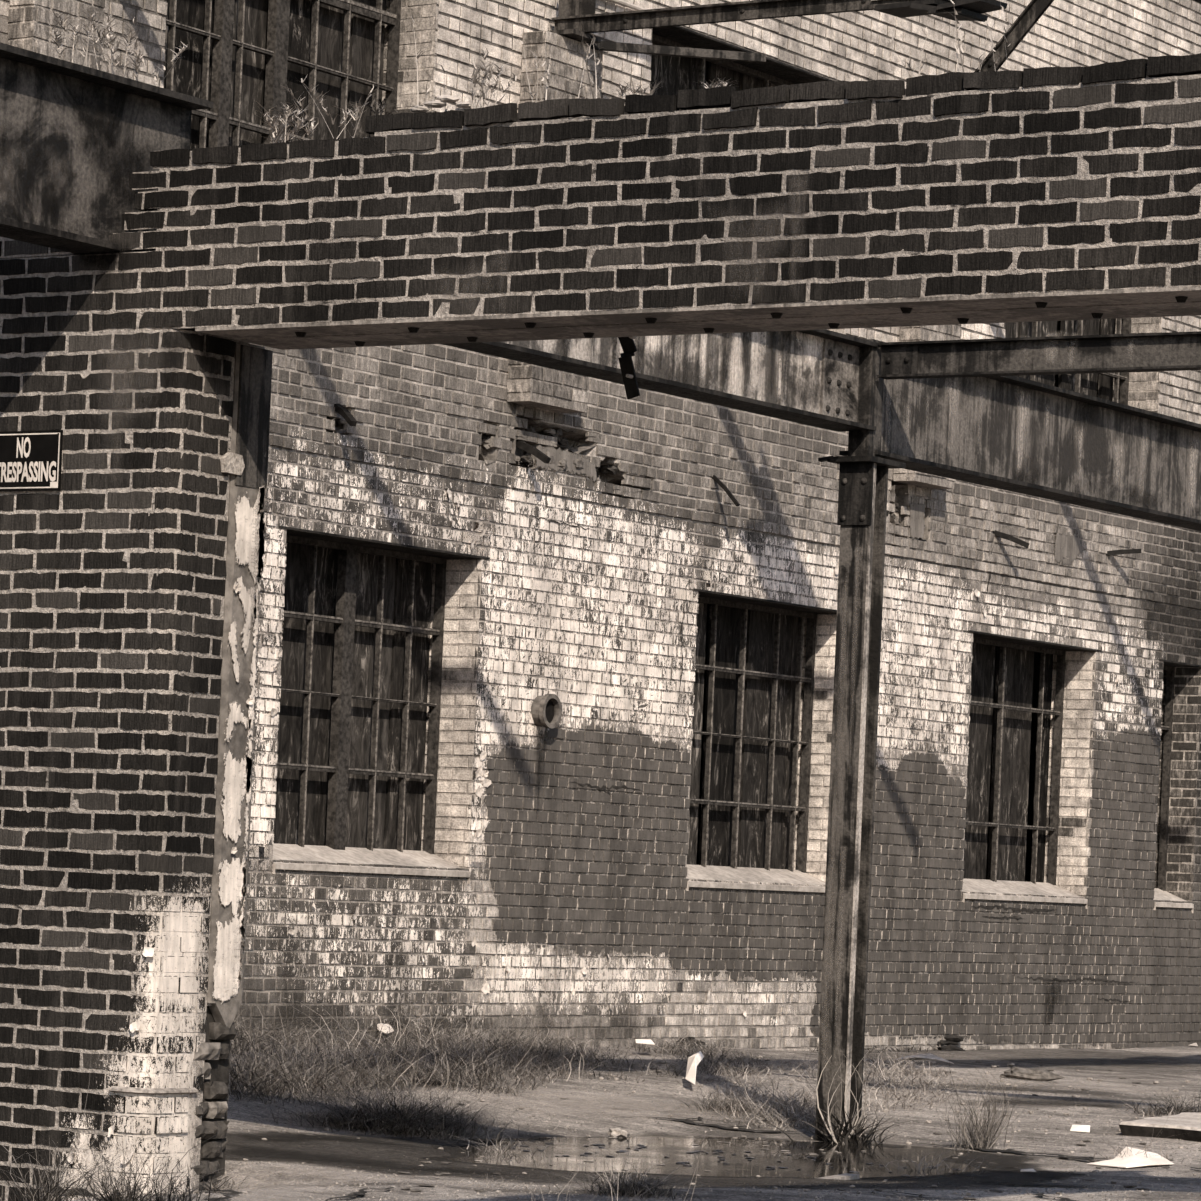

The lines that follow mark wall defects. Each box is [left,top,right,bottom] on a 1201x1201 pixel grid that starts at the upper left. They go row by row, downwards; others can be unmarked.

rust [1016,394,1029,468]
peeling [876,485,1167,788]
peeling [52,415,839,1200]